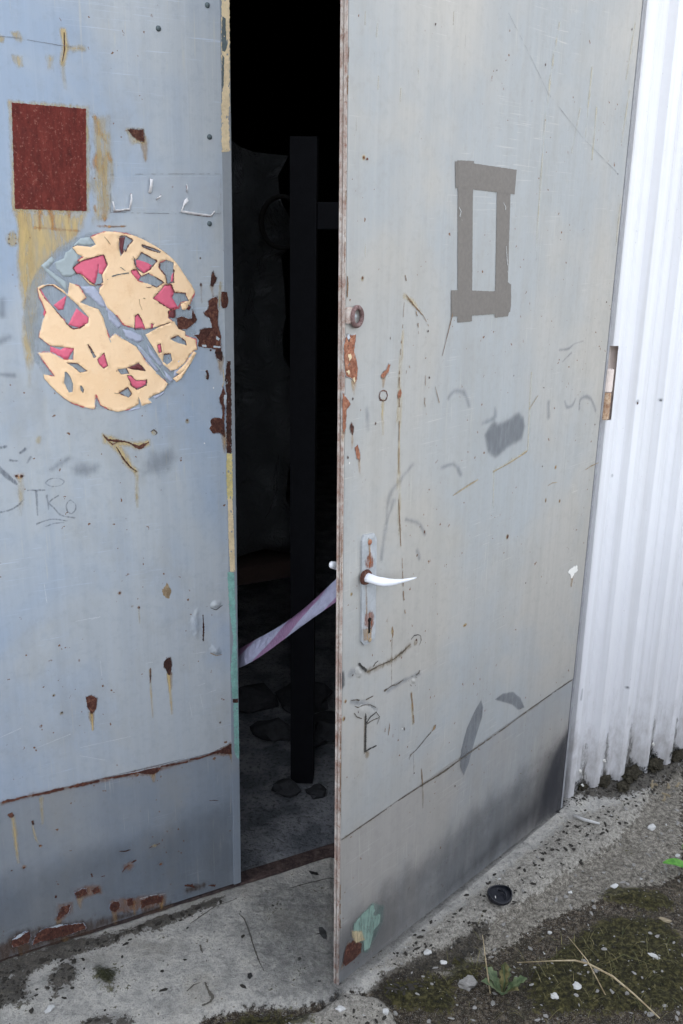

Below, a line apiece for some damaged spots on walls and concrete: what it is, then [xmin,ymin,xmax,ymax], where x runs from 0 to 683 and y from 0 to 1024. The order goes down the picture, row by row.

corrosion [127,128,145,143]
peeling [38,231,197,412]
corrosion [176,270,232,454]
corrosion [341,333,361,464]
corrosion [103,429,157,472]
corrosion [149,657,173,704]
corrosion [85,694,98,730]
corrosion [0,873,166,959]
peeling [343,905,383,966]